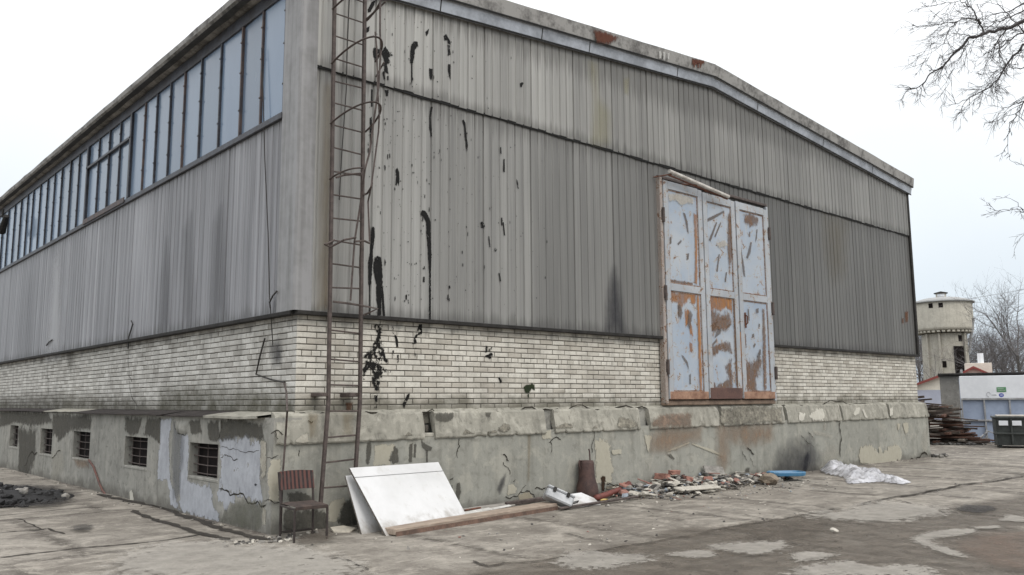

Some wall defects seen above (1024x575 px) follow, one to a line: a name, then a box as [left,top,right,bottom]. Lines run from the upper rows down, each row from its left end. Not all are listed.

corrosion [594,31,618,44]
corrosion [671,213,767,400]
leakage [52,413,91,441]
leakage [220,419,263,442]
crack [218,423,300,461]
spalling [644,414,691,452]
peeling [857,443,902,464]
peeling [125,417,282,525]
crack [219,488,279,508]